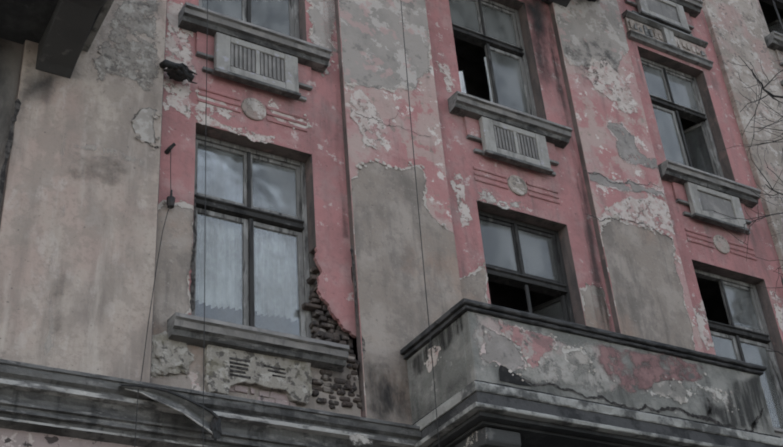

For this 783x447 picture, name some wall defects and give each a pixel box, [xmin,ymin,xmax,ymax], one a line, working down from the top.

flaking render [93,0,275,150]
peeling [553,0,659,169]
flaking render [150,0,490,425]
flaking render [473,171,714,404]
peeling [770,290,783,331]
crack [522,378,764,432]